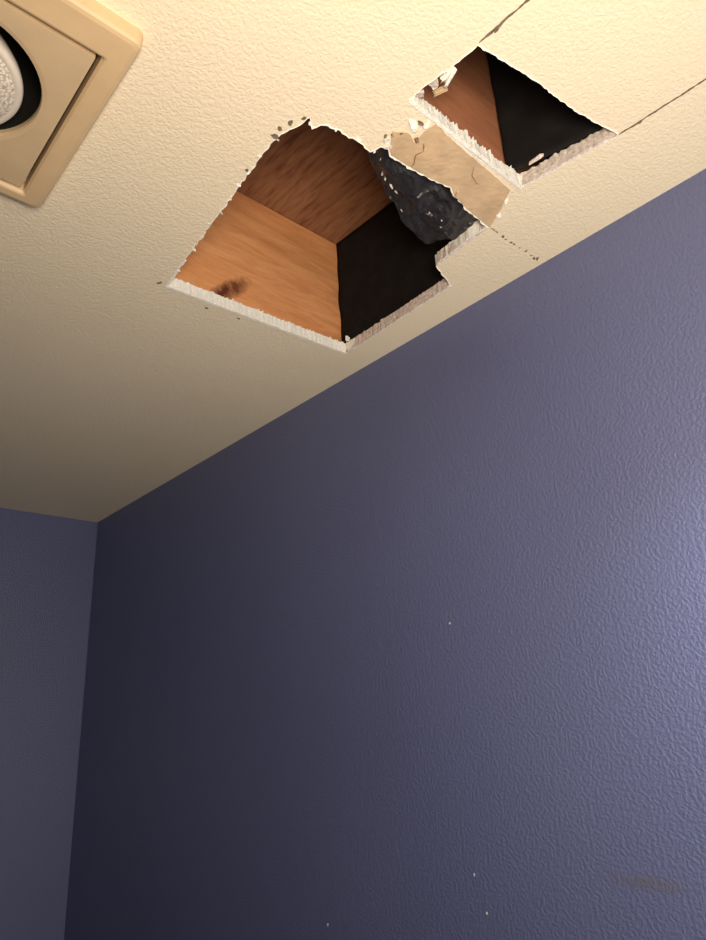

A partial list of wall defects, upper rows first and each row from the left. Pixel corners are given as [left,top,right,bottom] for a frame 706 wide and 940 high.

crack [479,0,530,43]
crack [619,78,706,135]
peeling [373,119,510,228]